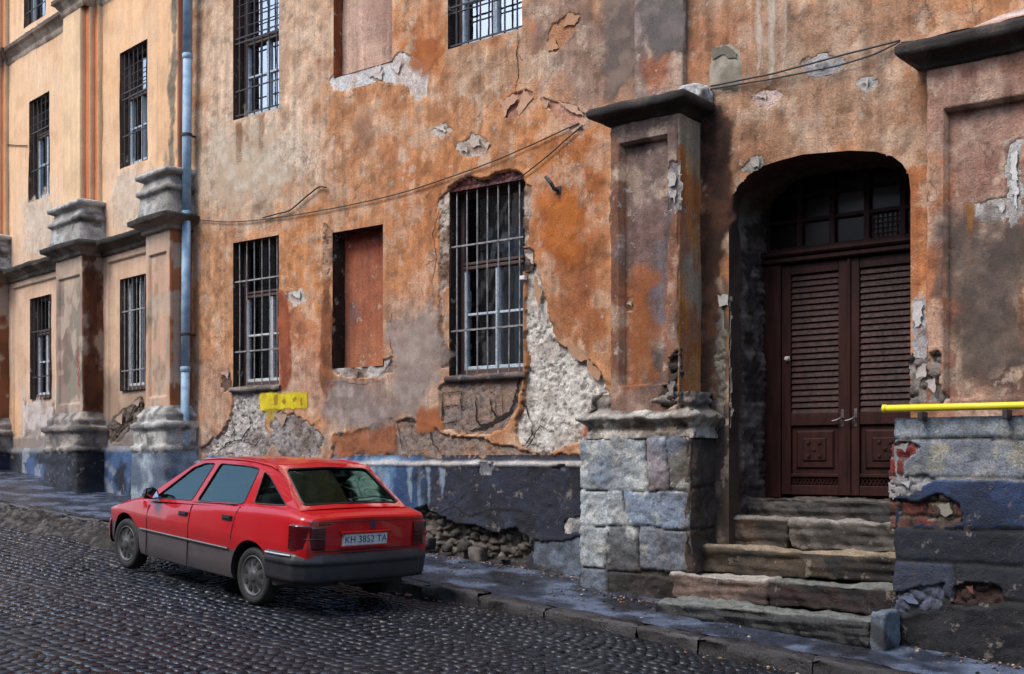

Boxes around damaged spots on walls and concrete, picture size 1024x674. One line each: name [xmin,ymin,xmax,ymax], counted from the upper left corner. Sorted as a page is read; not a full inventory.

peeling [546,13,581,52]
peeling [327,52,430,102]
peeling [500,89,587,132]
peeling [432,123,490,158]
peeling [667,161,683,211]
peeling [973,138,1024,228]
flaking render [332,171,609,475]
spalling [908,297,950,404]
flaking render [202,370,287,458]
flaking render [888,441,963,529]
spalling [418,506,531,562]
peeling [891,582,1005,614]